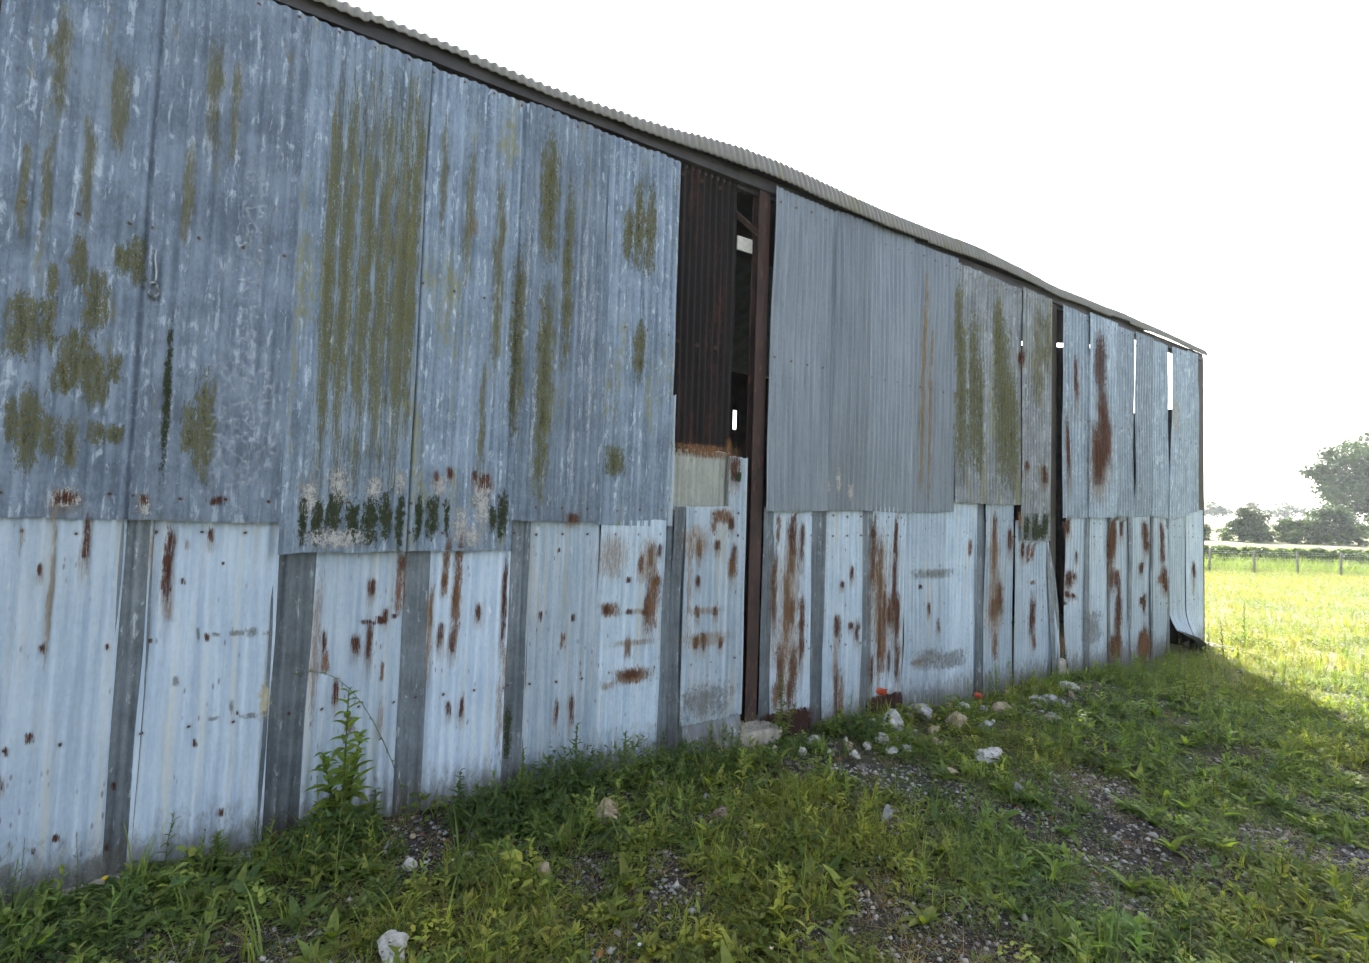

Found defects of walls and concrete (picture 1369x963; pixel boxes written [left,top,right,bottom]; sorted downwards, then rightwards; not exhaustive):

damp [2,58,149,474]
damp [158,311,218,486]
damp [297,58,451,551]
damp [477,126,576,503]
rust [673,160,742,482]
damp [952,280,1052,503]
rust [429,531,481,655]
damp [488,488,510,542]
rust [597,544,664,684]
rust [760,511,813,736]
rust [833,514,902,717]
rust [1107,518,1168,662]